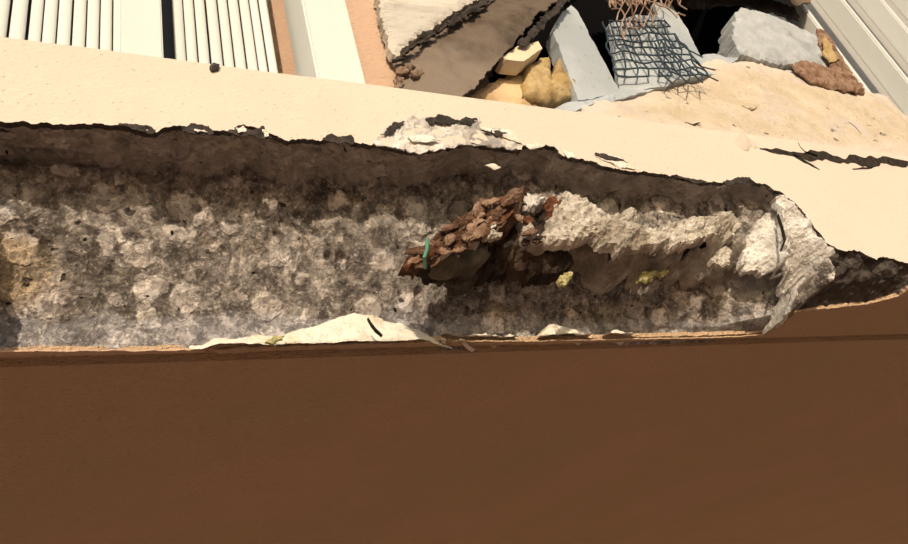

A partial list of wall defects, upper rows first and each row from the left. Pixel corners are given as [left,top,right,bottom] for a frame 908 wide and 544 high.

peeling [373,0,571,97]
peeling [670,0,811,21]
crack [760,142,908,170]
spalling [0,114,908,357]